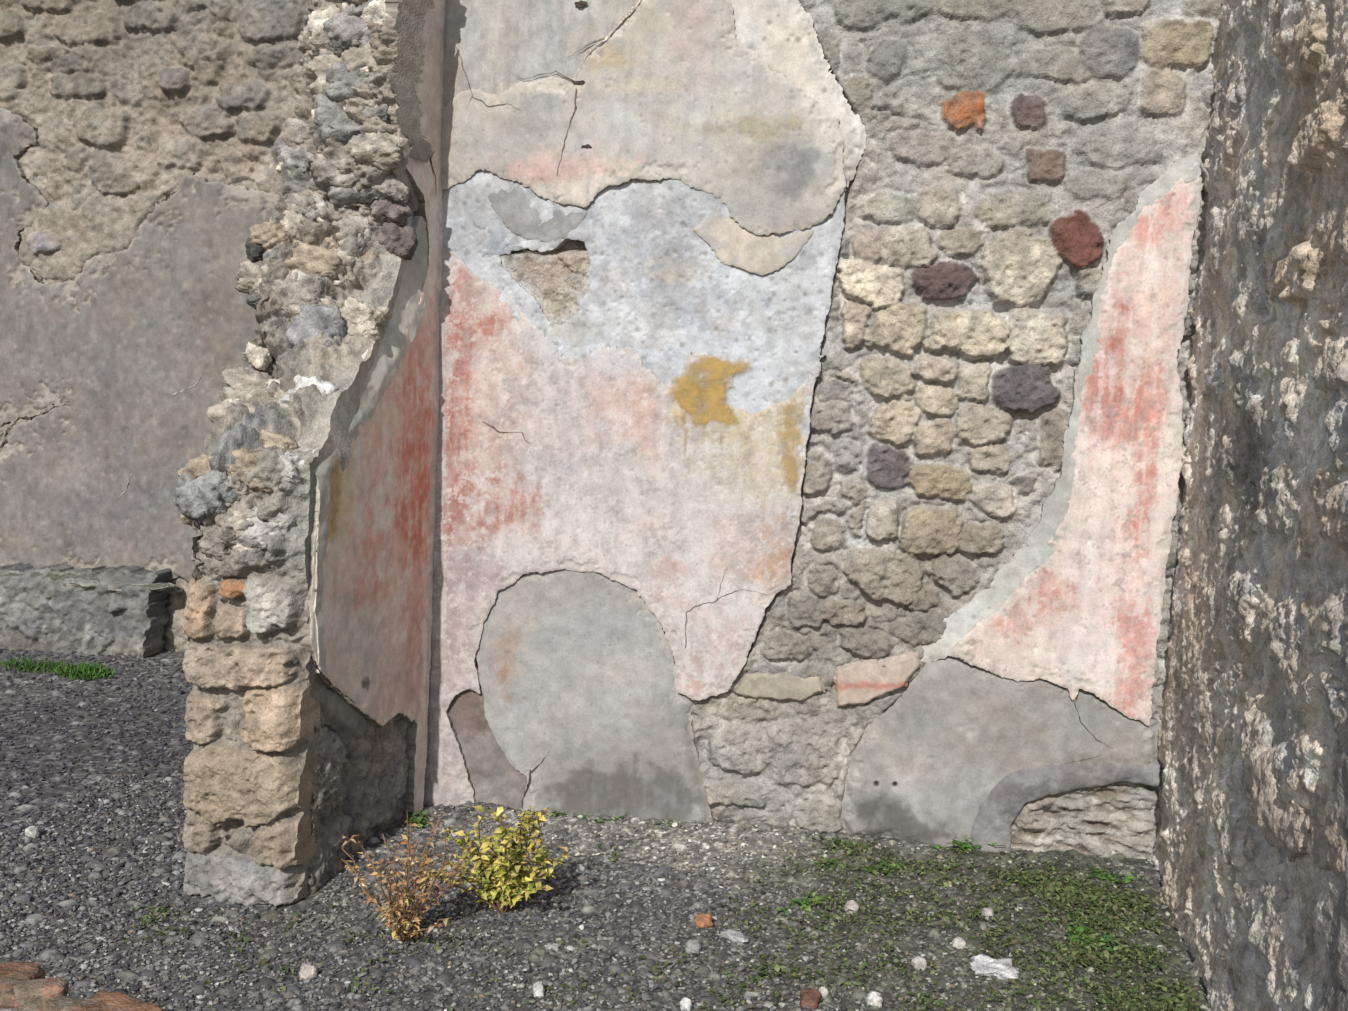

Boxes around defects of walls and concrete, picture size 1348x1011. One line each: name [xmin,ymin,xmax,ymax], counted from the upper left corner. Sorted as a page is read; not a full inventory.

crack [456,0,640,173]
flaking render [442,0,867,460]
flaking render [448,569,713,822]
flaking render [840,656,1162,846]